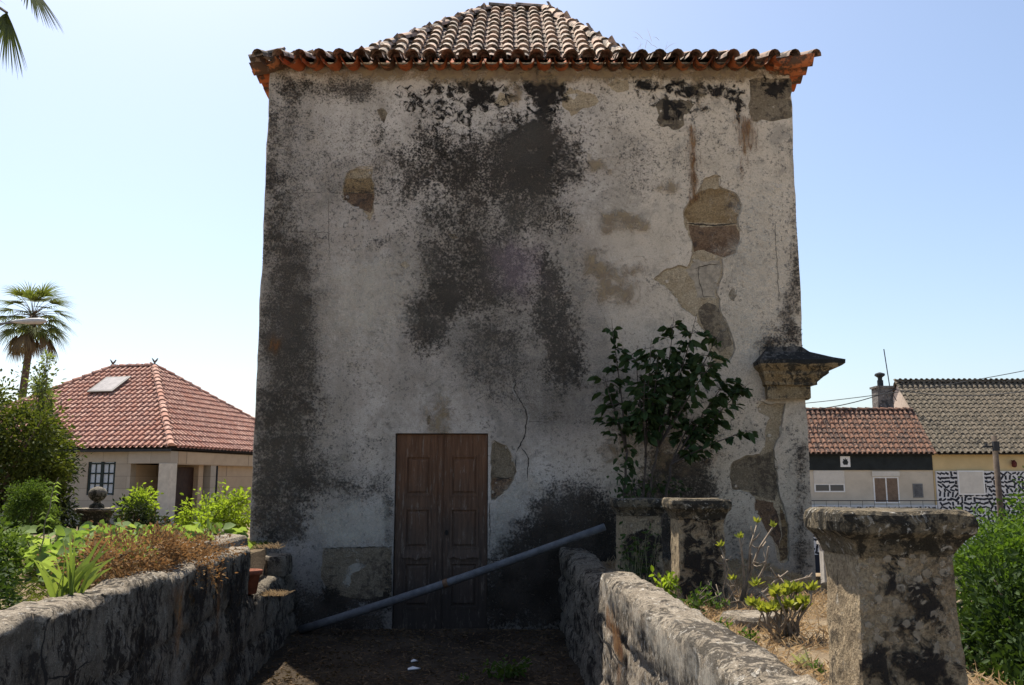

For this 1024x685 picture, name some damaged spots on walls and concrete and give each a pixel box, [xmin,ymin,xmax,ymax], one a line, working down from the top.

flaking render [748,74,792,122]
flaking render [334,159,383,229]
damp [250,67,781,553]
flaking render [646,167,752,374]
flaking render [488,432,525,508]
crack [513,367,549,477]
flaking render [721,393,798,573]